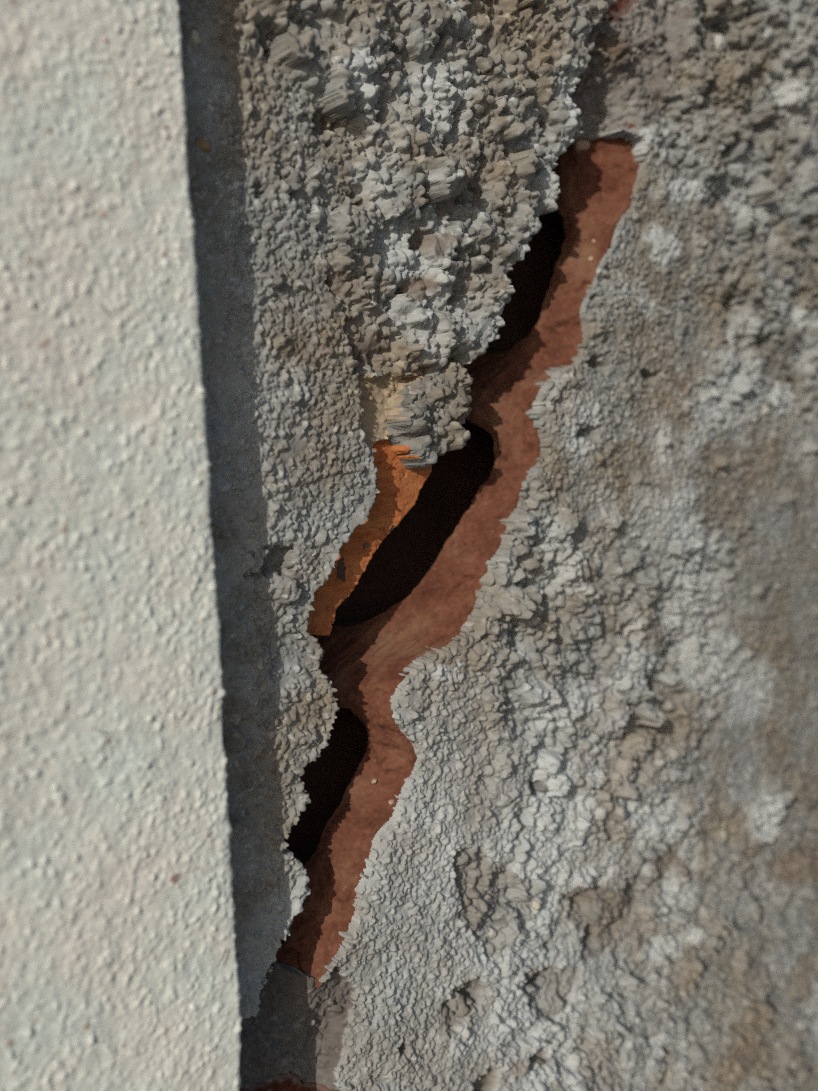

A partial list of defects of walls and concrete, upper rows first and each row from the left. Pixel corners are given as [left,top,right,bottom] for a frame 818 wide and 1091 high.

spalling [274,134,505,636]
spalling [583,352,608,373]
spalling [248,543,298,579]
crack [239,0,694,1091]
peeling [453,846,546,939]